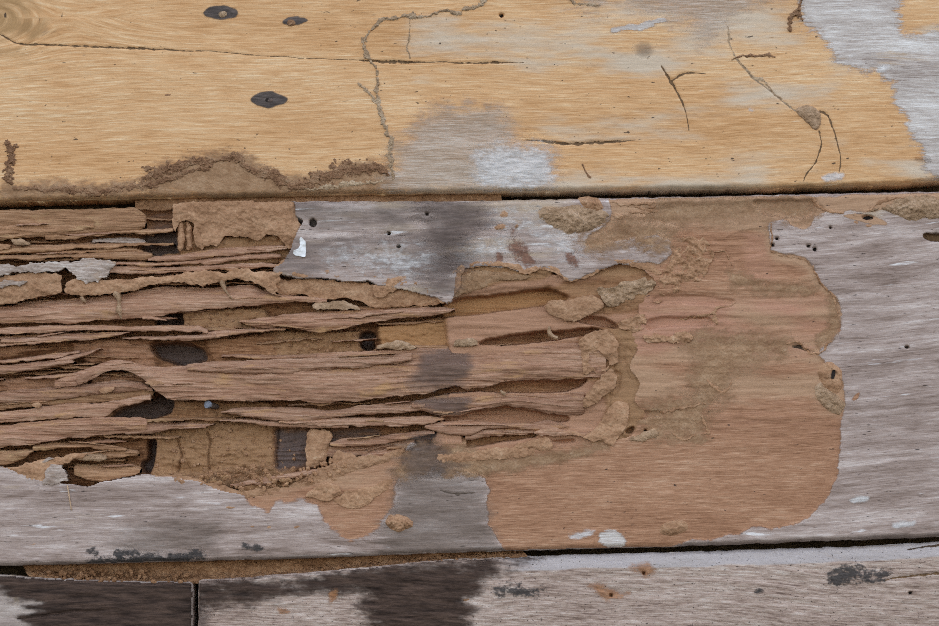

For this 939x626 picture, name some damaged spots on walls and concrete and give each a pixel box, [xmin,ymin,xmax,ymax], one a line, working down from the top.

crack [0,34,524,64]
peeling [244,193,939,550]
leakage [0,559,546,626]